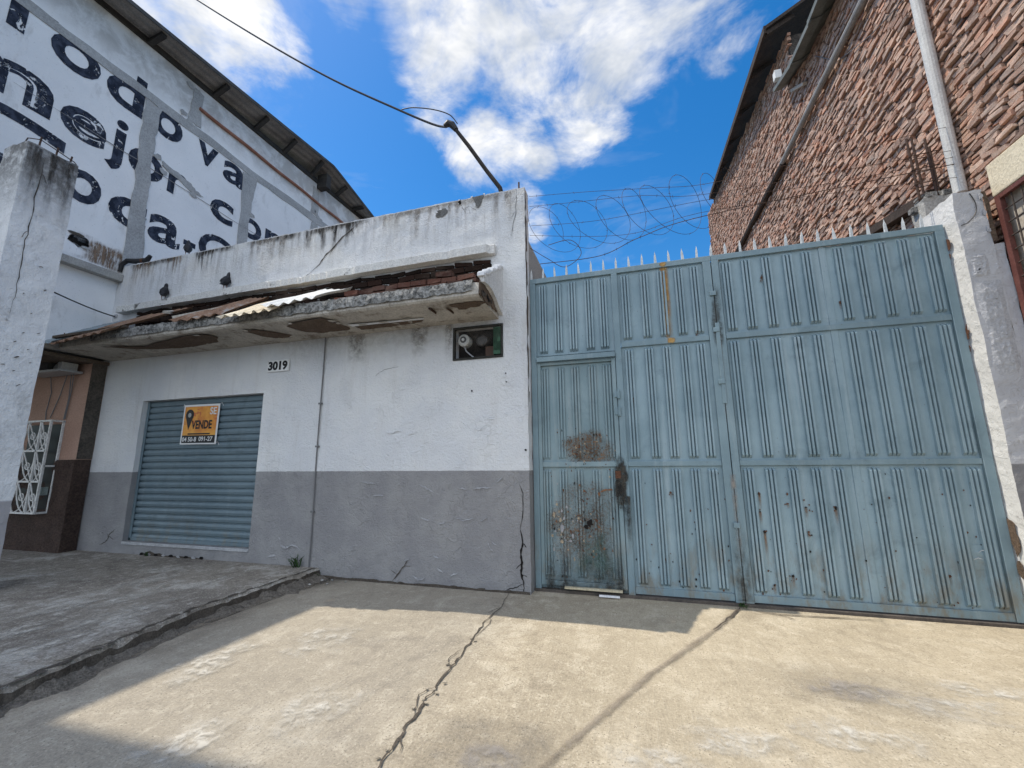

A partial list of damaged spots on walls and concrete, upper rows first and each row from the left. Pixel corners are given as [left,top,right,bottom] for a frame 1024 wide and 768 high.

crack [10,160,47,311]
leakage [252,220,362,245]
crack [306,228,354,276]
flaking render [135,260,503,340]
corrosion [660,262,675,343]
spalling [111,335,218,350]
corrosion [557,428,616,472]
spalling [1007,518,1024,579]
crack [375,480,527,768]